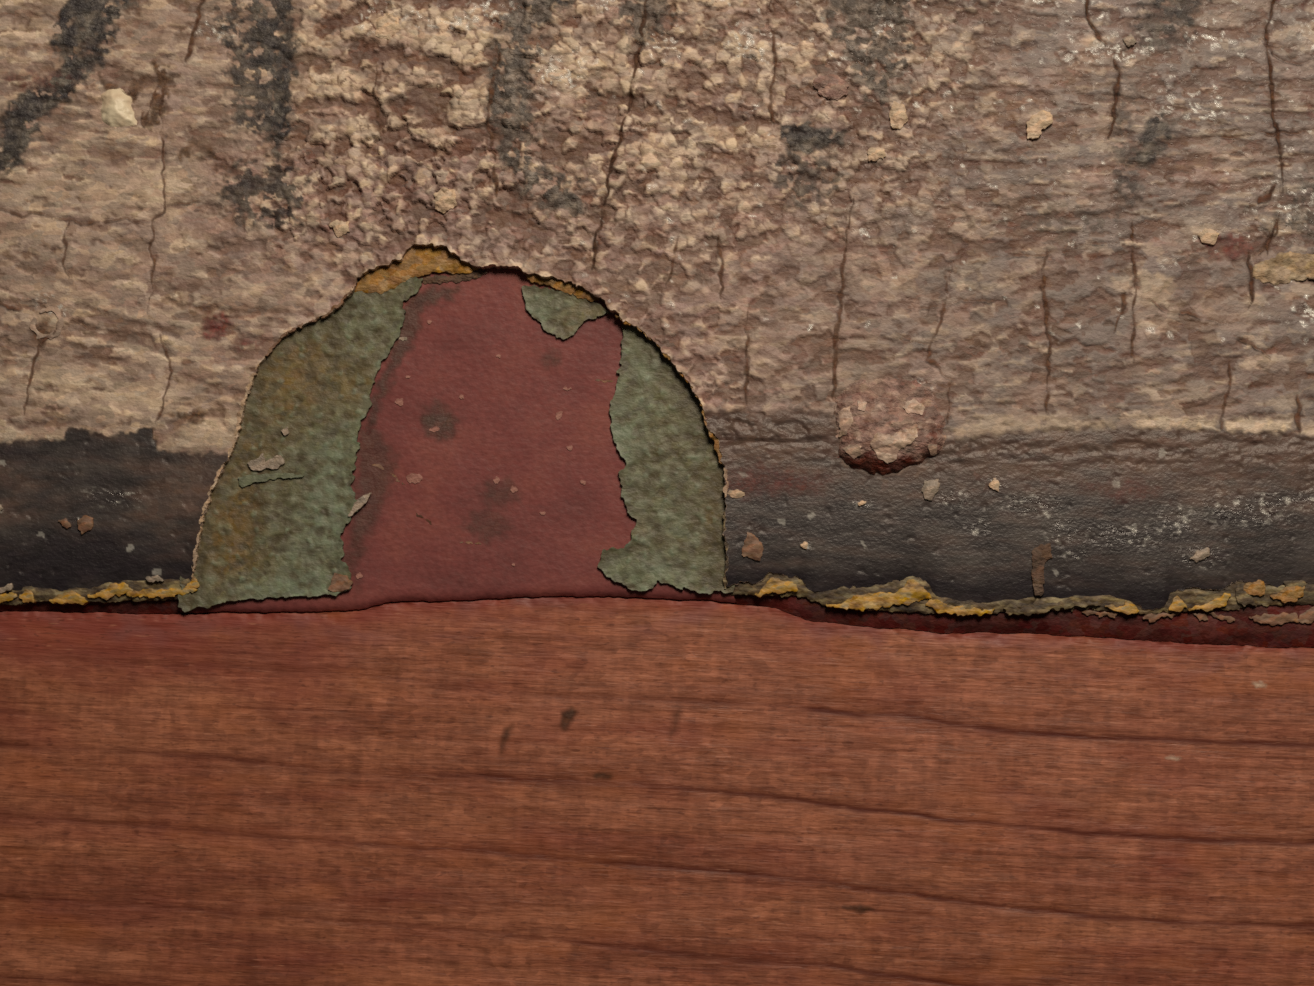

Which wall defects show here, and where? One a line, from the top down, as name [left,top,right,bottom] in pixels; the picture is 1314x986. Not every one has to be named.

crack [591,0,647,268]
crack [1085,0,1121,138]
crack [1221,0,1305,307]
peeling [0,245,1314,626]
crack [972,225,1270,427]
crack [1295,396,1314,432]